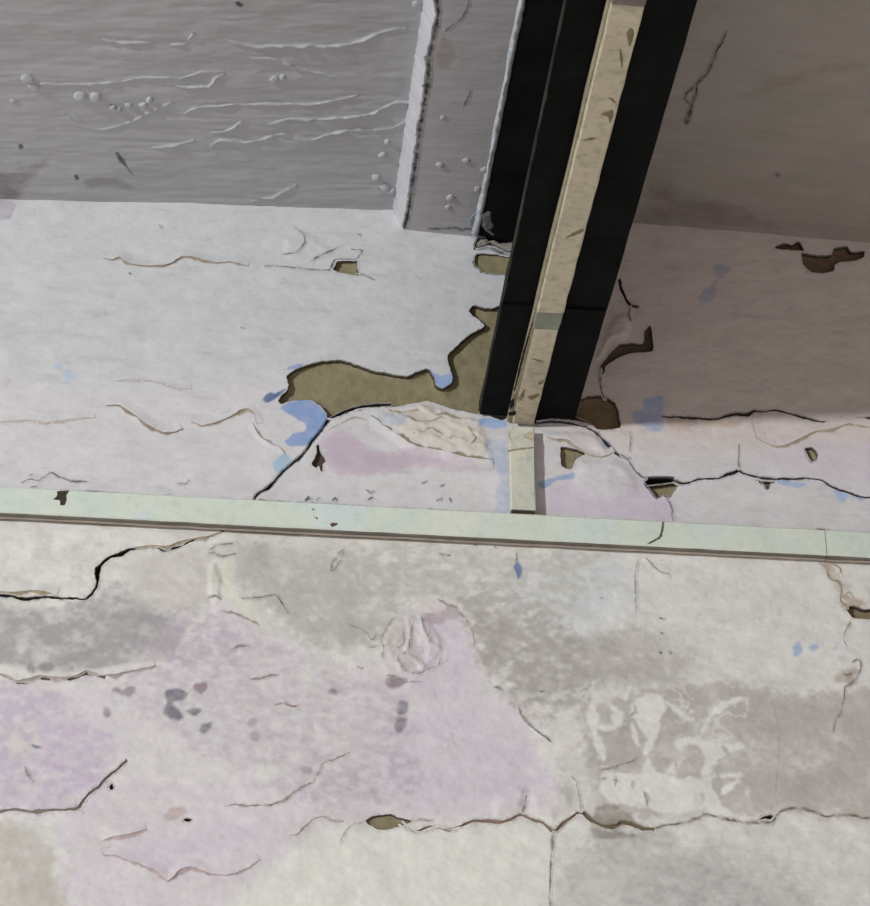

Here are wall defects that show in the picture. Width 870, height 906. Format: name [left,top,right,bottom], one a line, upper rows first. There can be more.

flaking render [330,257,361,277]
flaking render [468,211,512,275]
flaking render [773,240,867,275]
flaking render [596,324,655,377]
flaking render [104,304,513,483]
crack [662,408,832,423]
crack [253,403,478,500]
crack [508,418,648,481]
crack [0,531,236,603]
damp [0,531,870,906]
crack [0,758,130,816]
crack [398,775,870,906]